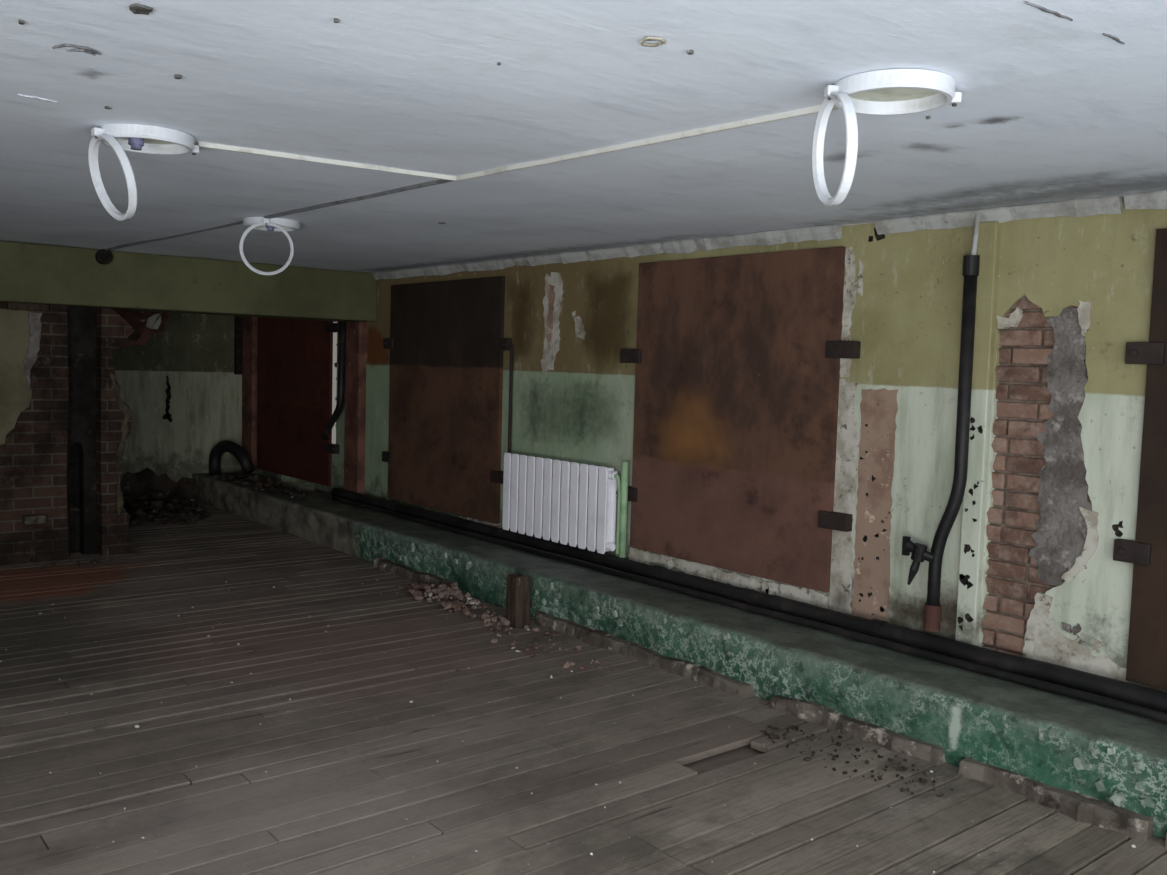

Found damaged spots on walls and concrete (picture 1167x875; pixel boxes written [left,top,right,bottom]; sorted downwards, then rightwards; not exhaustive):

flaking render [0,309,42,445]
flaking render [958,295,1129,682]
peeling [1074,740,1156,808]